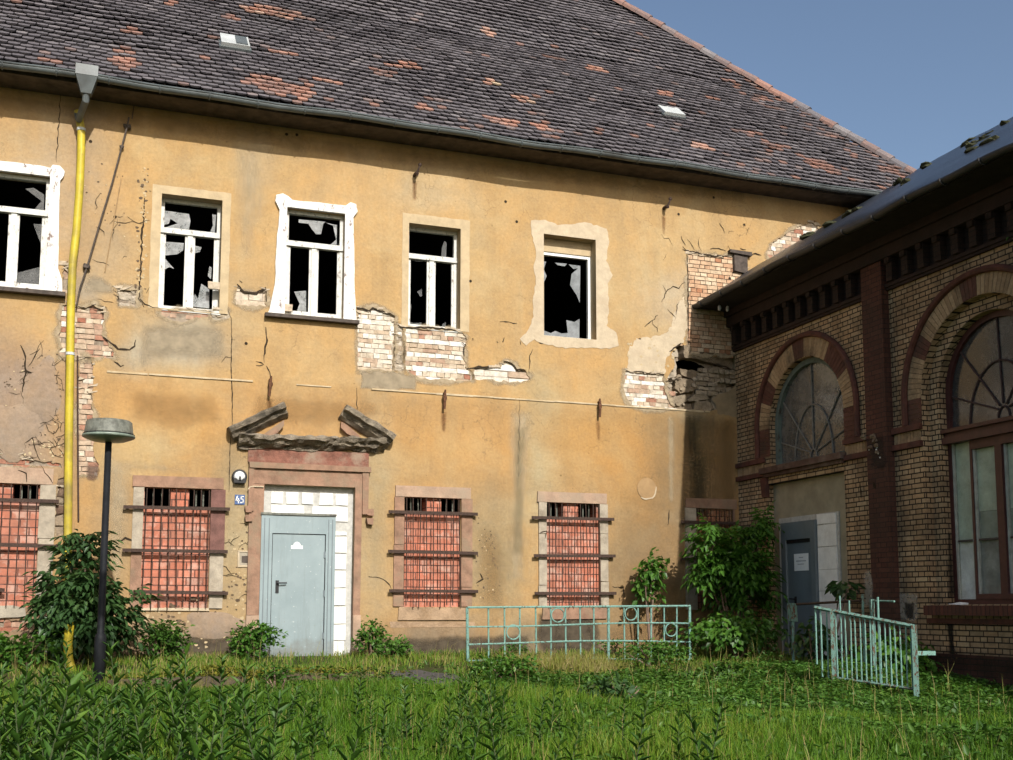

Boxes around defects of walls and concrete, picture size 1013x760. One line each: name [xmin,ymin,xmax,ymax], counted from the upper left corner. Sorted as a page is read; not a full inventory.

crack [0,342,65,483]
spalling [0,167,149,539]
crack [78,194,158,367]
spalling [156,286,271,326]
crack [223,319,233,485]
crack [237,280,267,302]
crack [256,327,271,376]
spalling [355,303,533,385]
spalling [620,249,750,413]
crack [627,224,760,382]
leakage [687,418,709,513]
spalling [0,619,30,632]